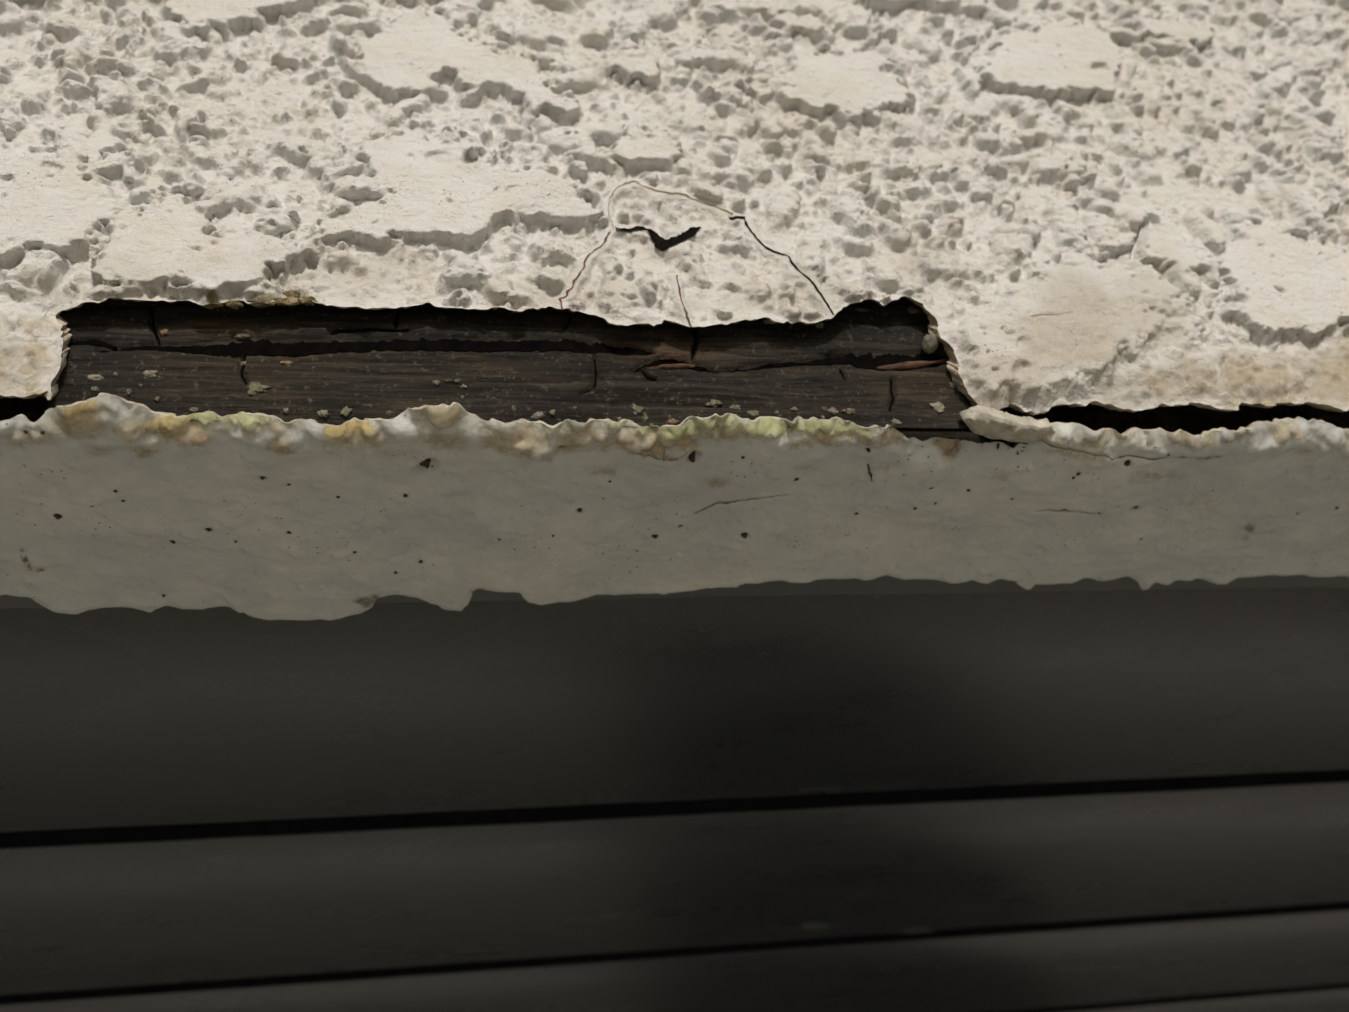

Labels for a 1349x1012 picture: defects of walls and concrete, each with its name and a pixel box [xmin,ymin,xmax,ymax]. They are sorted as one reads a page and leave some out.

crack [559,180,835,359]
spalling [37,290,830,400]
crack [581,359,597,395]
peeling [843,296,1055,455]
damp [19,399,294,457]
spalling [317,406,353,418]
damp [324,418,383,447]
damp [421,403,464,446]
damp [482,422,749,459]
spalling [705,399,798,417]
damp [786,418,902,447]
crack [986,408,1349,460]